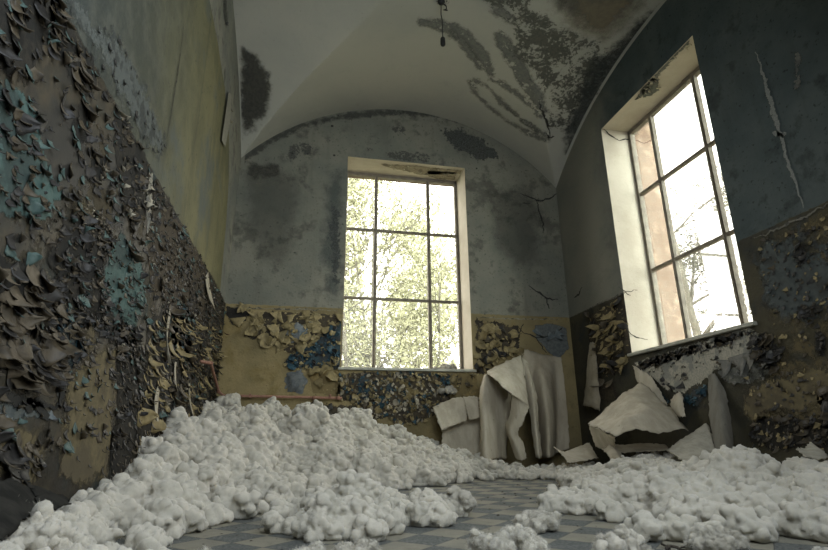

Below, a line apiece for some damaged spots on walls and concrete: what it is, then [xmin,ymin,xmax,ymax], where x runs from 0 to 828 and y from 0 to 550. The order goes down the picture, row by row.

water stain [559,0,637,33]
water stain [241,48,270,130]
water stain [440,126,499,161]
water stain [418,18,549,142]
water stain [565,12,652,154]
crack [755,52,804,208]
peeling [0,0,371,486]
water stain [327,205,343,286]
peeling [451,319,524,397]
peeling [584,203,828,460]